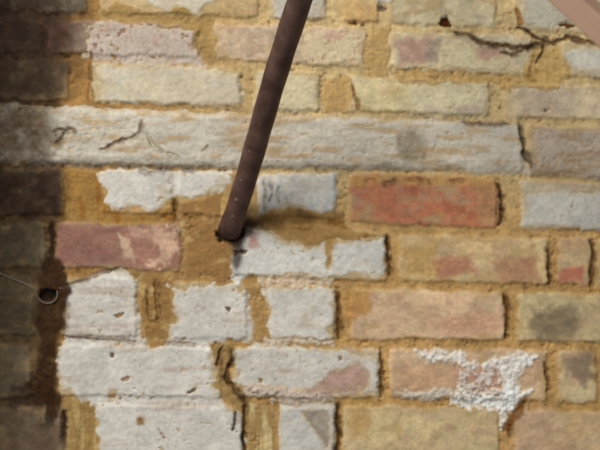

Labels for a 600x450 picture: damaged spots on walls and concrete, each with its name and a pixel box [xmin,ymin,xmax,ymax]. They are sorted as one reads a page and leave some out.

leakage [0,0,71,163]
crack [52,128,77,143]
crack [99,120,181,159]
peeling [81,0,246,107]
peeling [261,43,600,179]
crack [452,8,595,64]
leakage [0,169,59,221]
peeling [0,102,391,450]
leakage [9,259,71,439]
crack [215,347,246,450]
leakage [394,346,540,435]